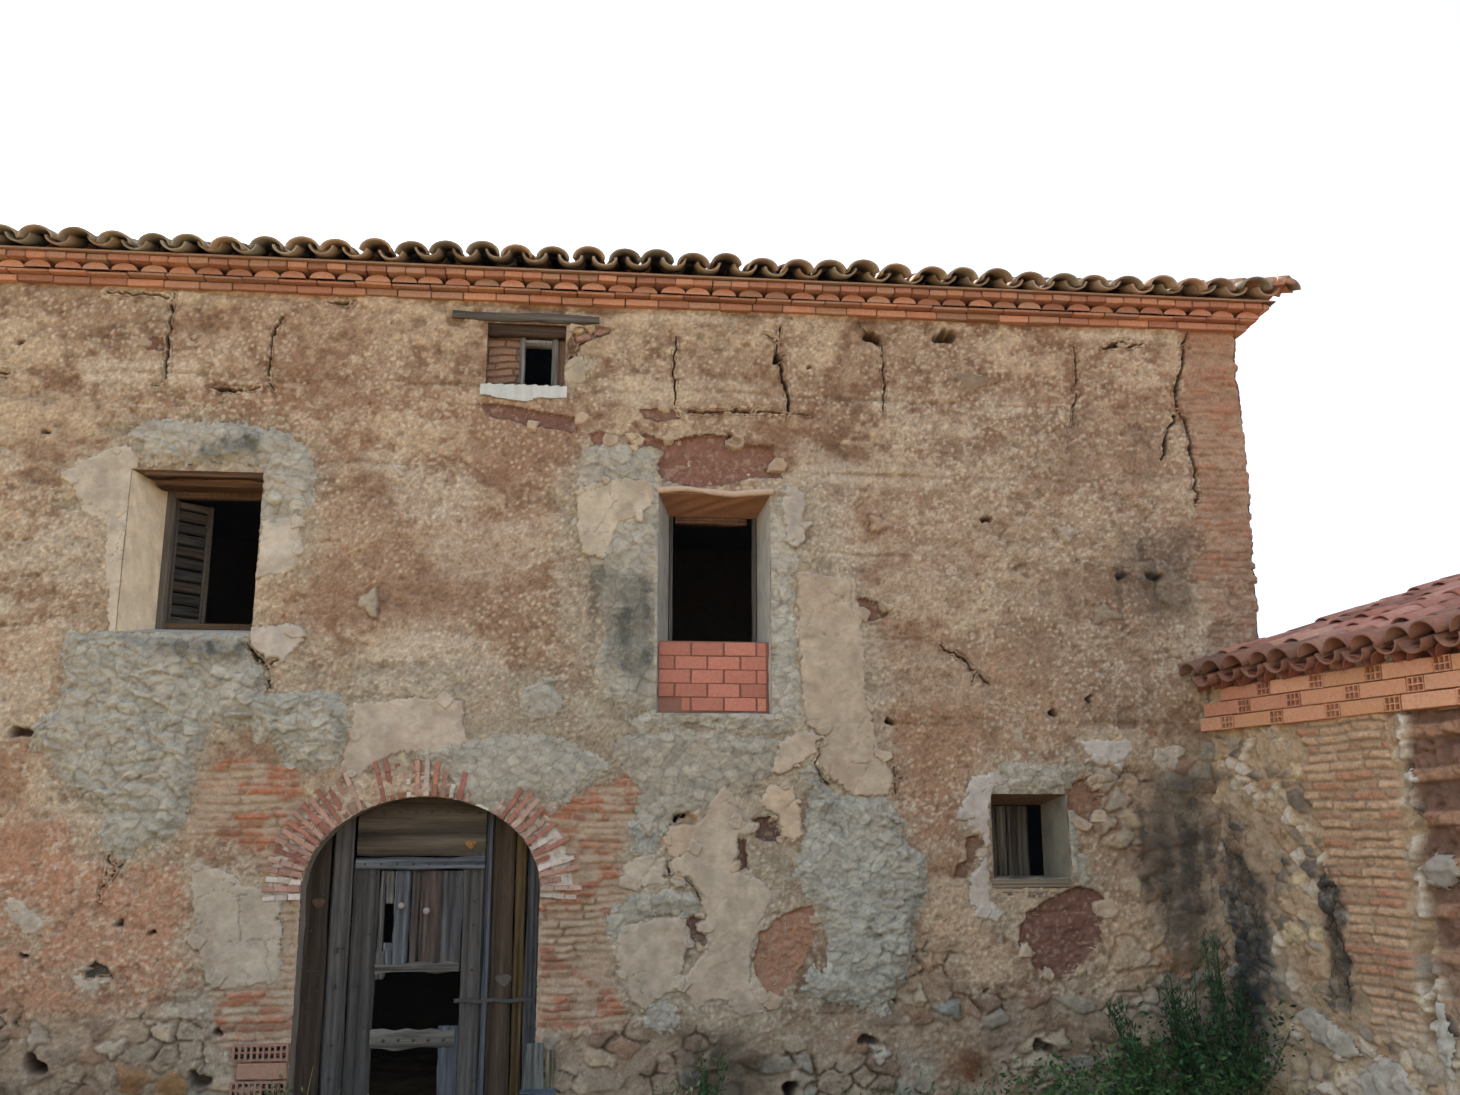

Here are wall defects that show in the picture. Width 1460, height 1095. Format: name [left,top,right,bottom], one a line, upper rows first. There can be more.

crack [0,368,11,379]
crack [670,324,816,422]
crack [1069,331,1201,507]
spalling [478,403,814,560]
flaking render [250,622,308,663]
flaking render [610,572,894,1017]
spalling [1065,738,1133,832]
flaking render [1152,744,1185,771]
flaking render [955,772,1008,922]
spalling [1018,886,1120,982]